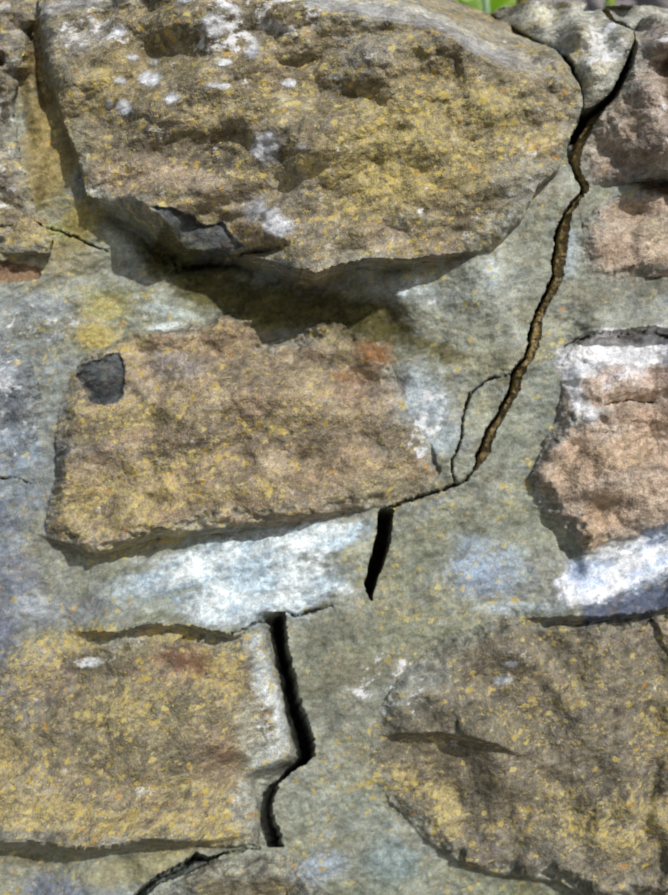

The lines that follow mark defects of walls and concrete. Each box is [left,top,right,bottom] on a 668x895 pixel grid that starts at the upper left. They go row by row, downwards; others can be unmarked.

crack [364,6,636,601]
crack [609,327,668,339]
crack [134,609,321,895]